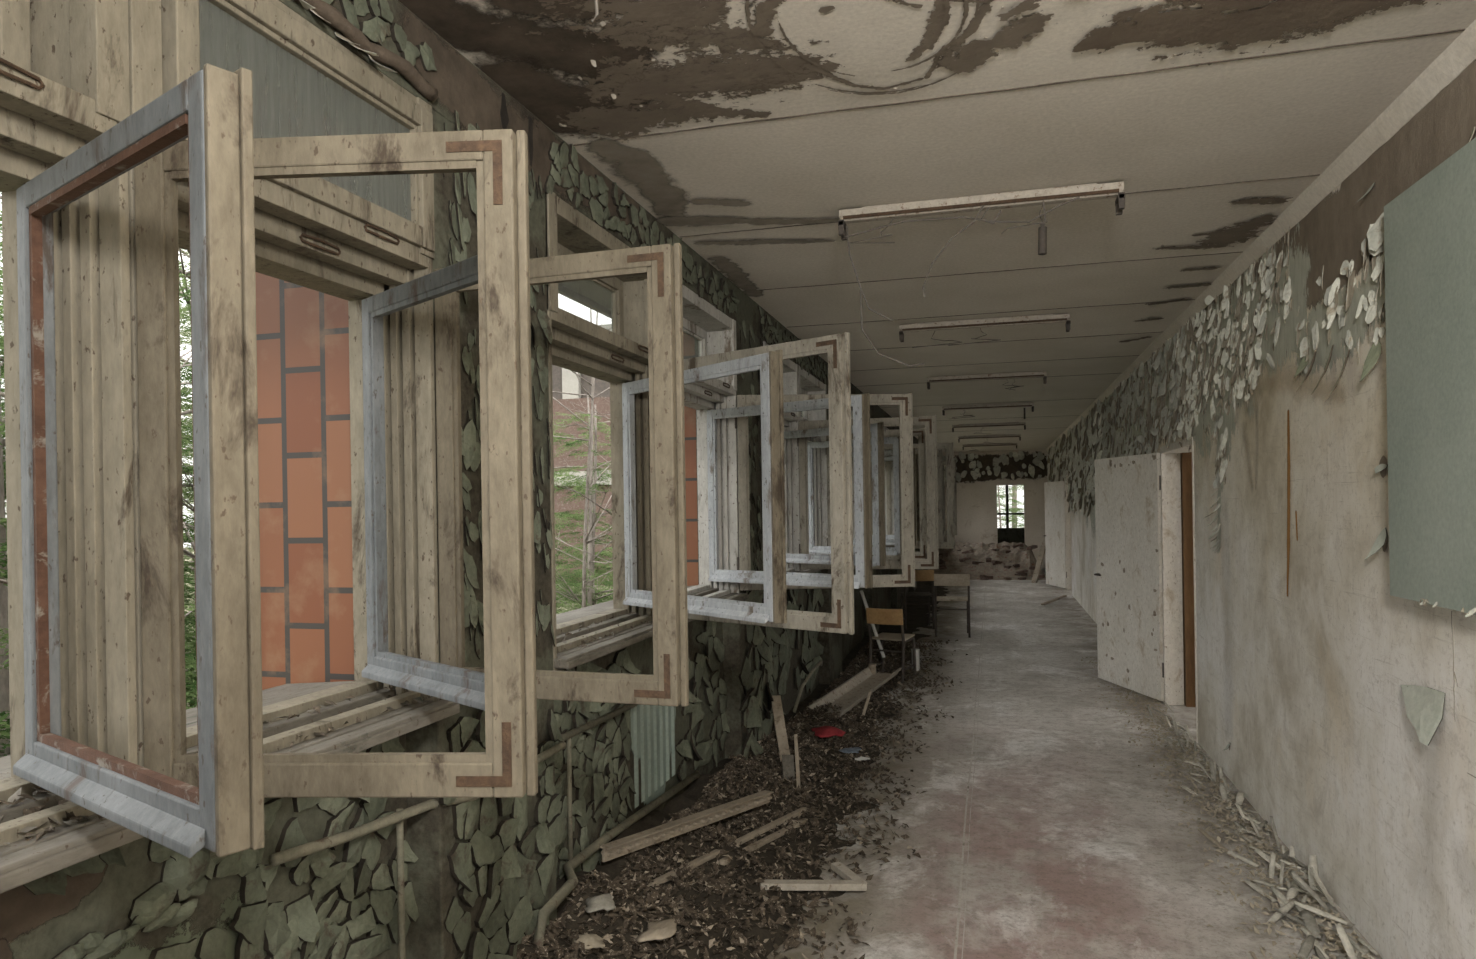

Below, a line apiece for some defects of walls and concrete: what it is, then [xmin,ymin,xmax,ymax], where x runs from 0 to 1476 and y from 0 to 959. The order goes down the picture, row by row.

peeling [1072,0,1447,67]
peeling [323,0,1057,384]
spalling [943,60,1476,553]
peeling [738,415,763,571]
peeling [358,737,405,753]
peeling [1401,685,1446,746]
spalling [0,847,127,959]
peeling [108,798,418,959]